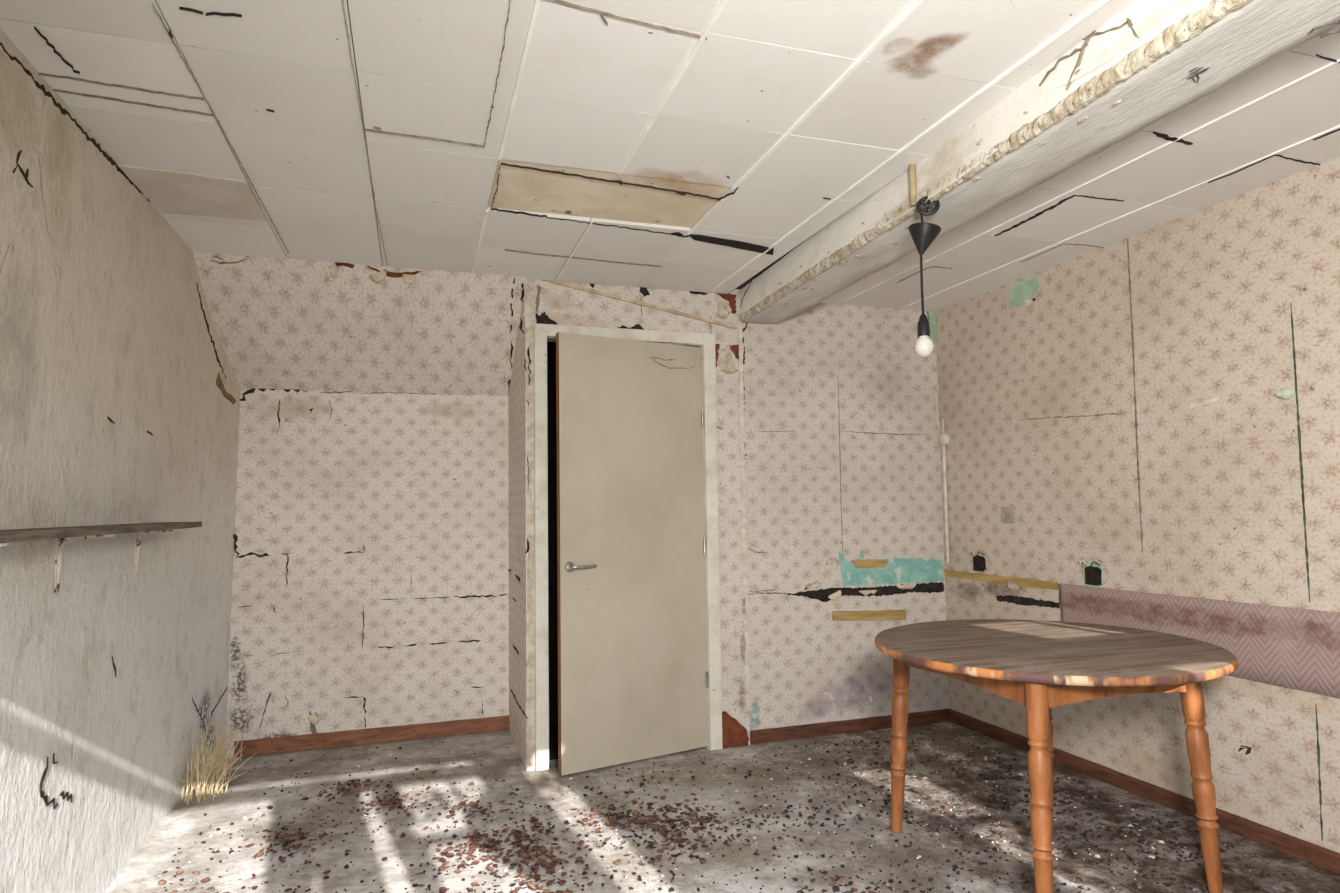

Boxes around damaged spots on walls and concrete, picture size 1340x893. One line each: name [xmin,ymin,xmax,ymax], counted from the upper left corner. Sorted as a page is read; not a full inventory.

crack [1039,18,1140,90]
spalling [1308,19,1340,38]
crack [0,26,213,202]
spalling [689,0,1252,323]
peeling [329,262,421,284]
crack [196,256,460,427]
crack [233,533,309,612]
peeling [804,550,944,601]
crack [362,580,516,649]